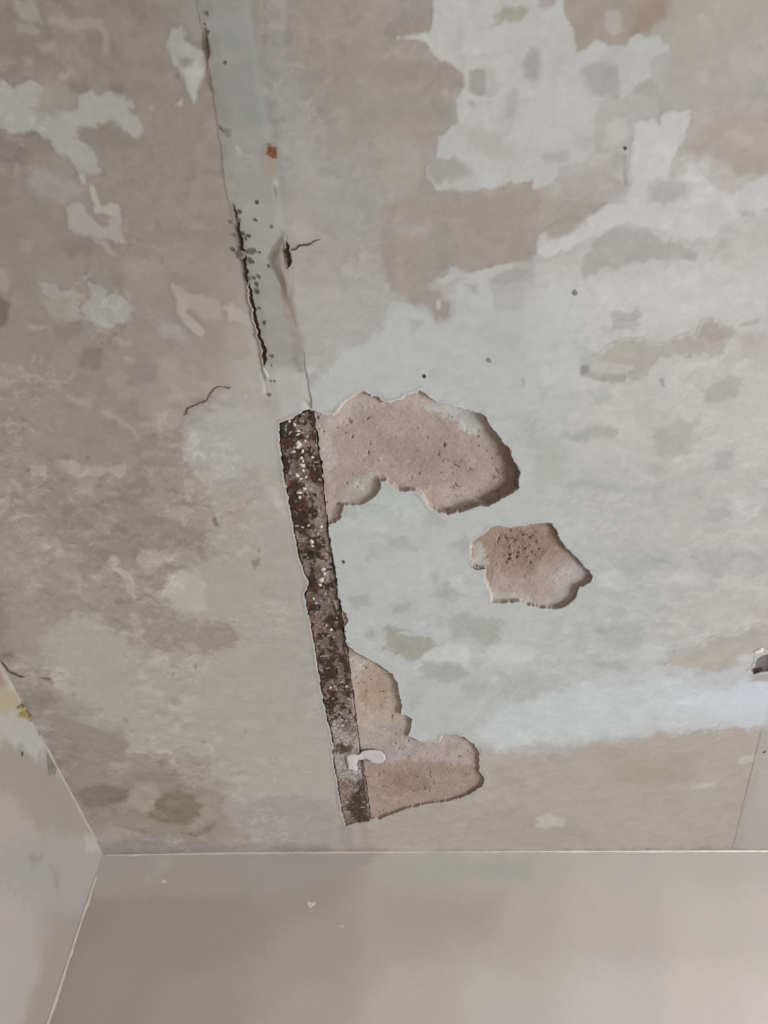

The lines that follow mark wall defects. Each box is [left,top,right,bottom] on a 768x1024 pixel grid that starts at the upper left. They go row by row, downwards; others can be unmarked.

crack [234,205,269,380]
crack [284,233,321,268]
crack [183,386,231,417]
peeling [28,262,768,827]
damp [0,669,230,840]